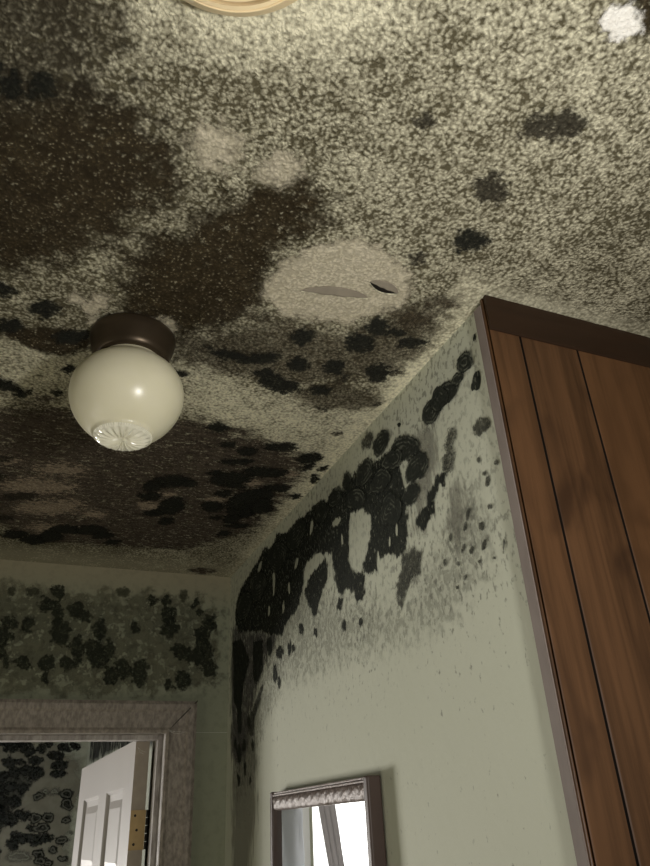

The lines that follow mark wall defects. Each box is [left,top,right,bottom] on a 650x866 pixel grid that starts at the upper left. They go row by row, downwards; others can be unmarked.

leakage [0,0,331,335]
leakage [453,229,491,255]
leakage [0,299,91,375]
leakage [203,328,350,413]
leakage [365,362,405,383]
leakage [344,315,430,354]
leakage [422,350,480,425]
leakage [0,379,328,550]
leakage [0,585,150,688]
leakage [147,590,218,691]
leakage [231,423,456,787]
leakage [0,741,133,866]